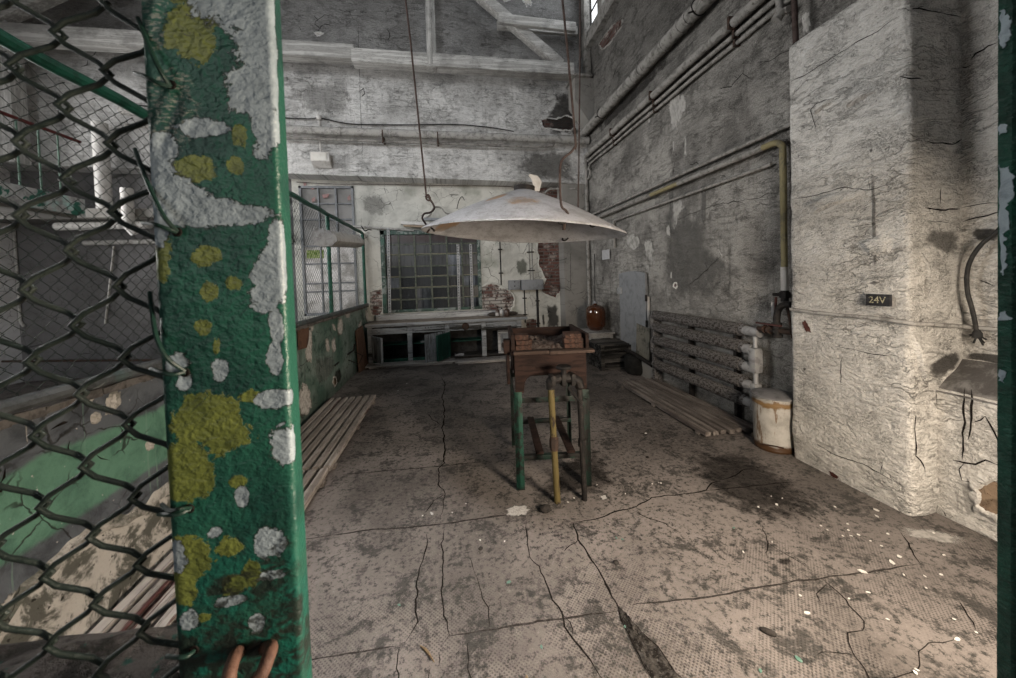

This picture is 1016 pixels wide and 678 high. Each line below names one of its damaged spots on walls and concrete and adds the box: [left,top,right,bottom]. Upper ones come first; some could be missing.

flaking render [538,115,578,132]
flaking render [539,187,557,199]
flaking render [536,242,560,299]
peeling [305,326,314,363]
peeling [299,382,312,417]
crack [813,442,895,482]
crack [955,389,997,482]
crack [396,377,471,678]
flaking render [967,474,997,524]
crack [525,527,602,678]
crack [564,481,716,678]
crack [762,527,953,678]